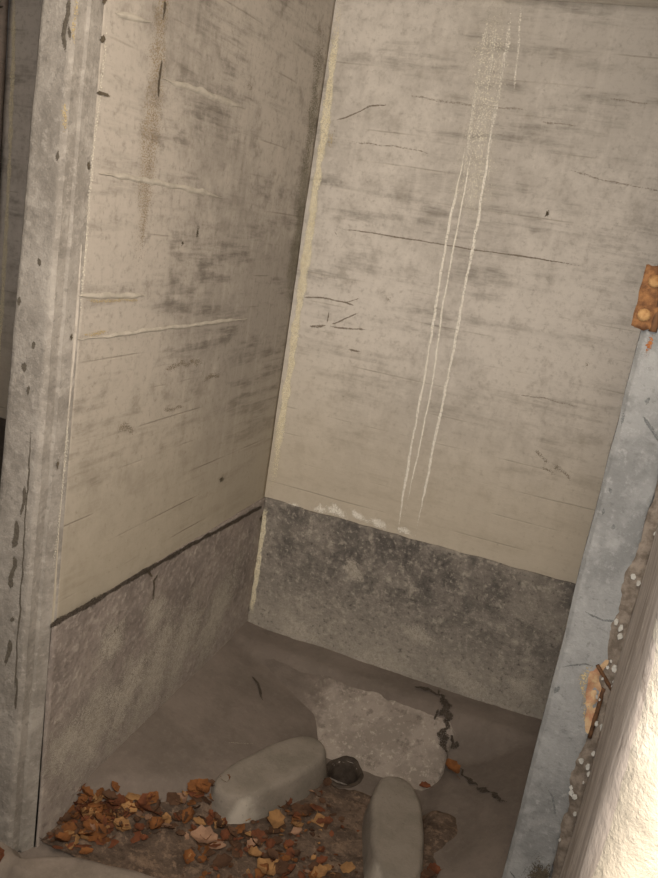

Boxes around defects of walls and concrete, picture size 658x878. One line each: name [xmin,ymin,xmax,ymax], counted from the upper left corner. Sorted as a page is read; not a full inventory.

damp [399,5,522,536]
crack [415,686,507,802]
spalling [551,483,658,878]